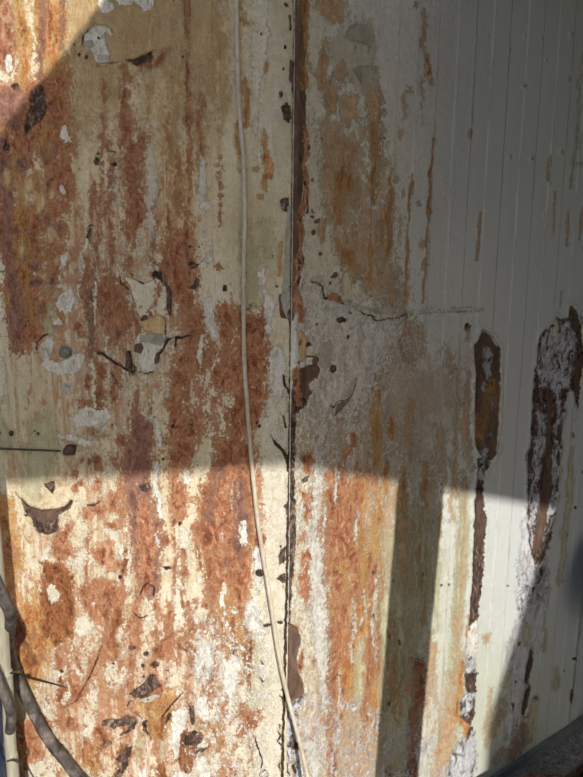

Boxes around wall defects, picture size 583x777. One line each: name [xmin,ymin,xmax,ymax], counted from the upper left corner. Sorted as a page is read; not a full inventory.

peeling [73,24,174,77]
corrosion [314,37,434,365]
peeling [52,216,108,331]
corrosion [0,0,278,777]
peeling [119,270,172,374]
peeling [266,323,323,414]
crack [271,0,474,777]
spalling [526,305,583,565]
spalling [15,492,73,562]
peeling [103,528,155,605]
spalling [460,329,504,739]
spalling [79,612,182,740]